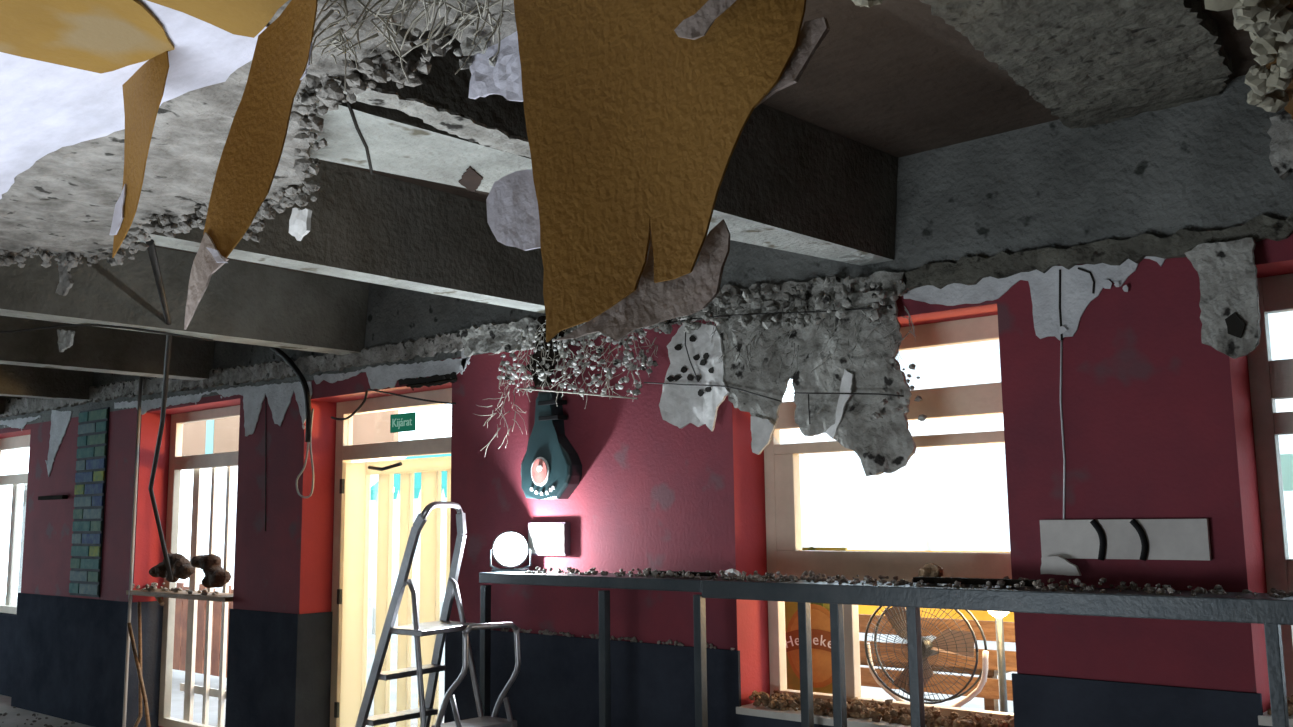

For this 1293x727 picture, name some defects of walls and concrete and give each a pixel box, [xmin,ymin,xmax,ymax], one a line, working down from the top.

flaking render [852,0,883,8]
flaking render [919,0,1233,129]
flaking render [0,0,531,330]
flaking render [1267,110,1293,180]